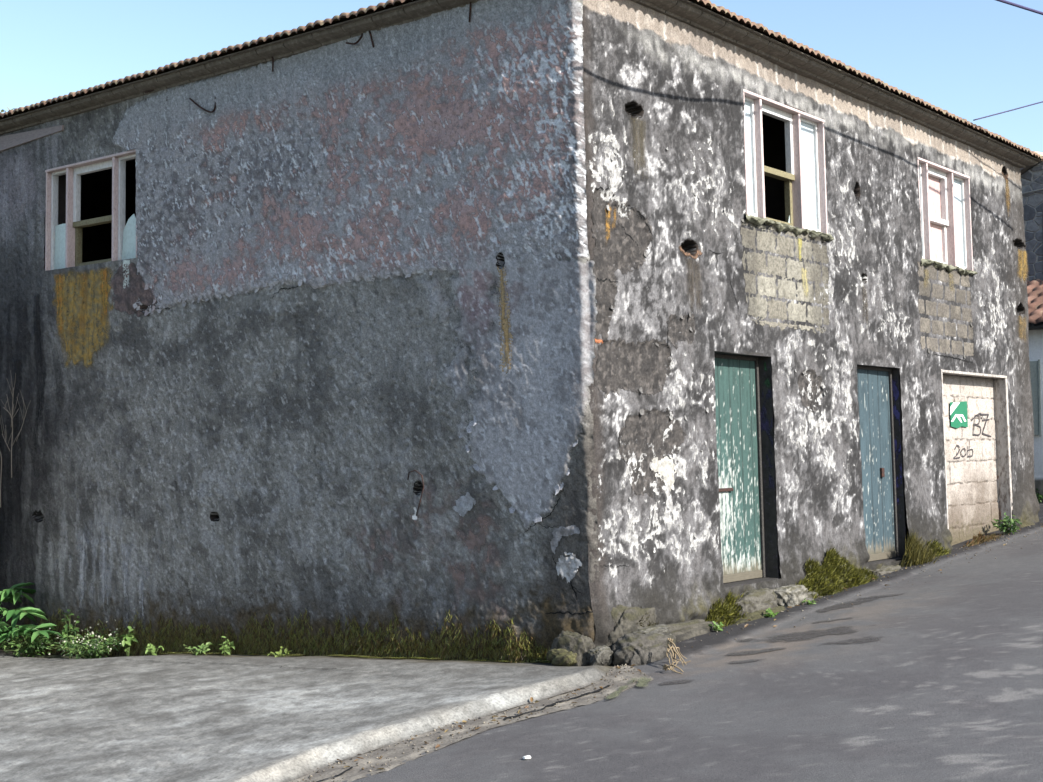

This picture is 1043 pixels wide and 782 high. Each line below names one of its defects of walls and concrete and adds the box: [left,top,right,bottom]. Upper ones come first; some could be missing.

damp [1,295,49,582]
peeling [110,6,719,578]
corrosion [497,267,513,374]
flaking render [556,552,582,584]
flaking render [671,122,1025,508]